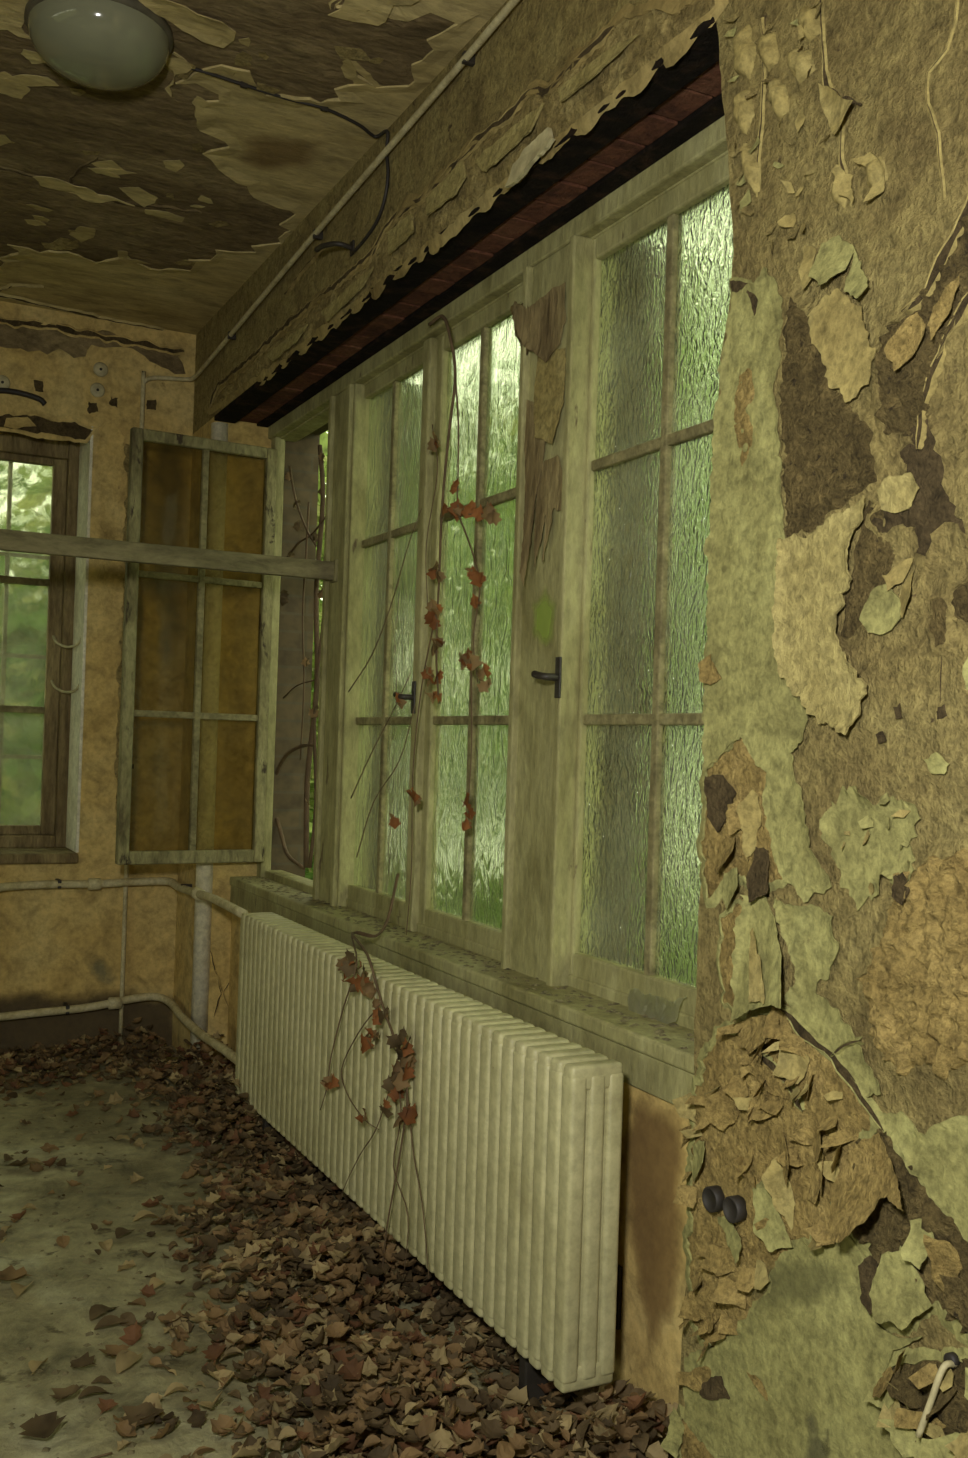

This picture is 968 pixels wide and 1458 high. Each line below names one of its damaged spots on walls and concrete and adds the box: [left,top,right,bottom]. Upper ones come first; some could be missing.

flaking render [0,0,481,274]
flaking render [207,0,729,415]
peeling [818,83,862,135]
flaking render [0,397,118,443]
flaking render [0,310,191,383]
flaking render [661,215,968,1458]
leakage [630,1112,678,1328]